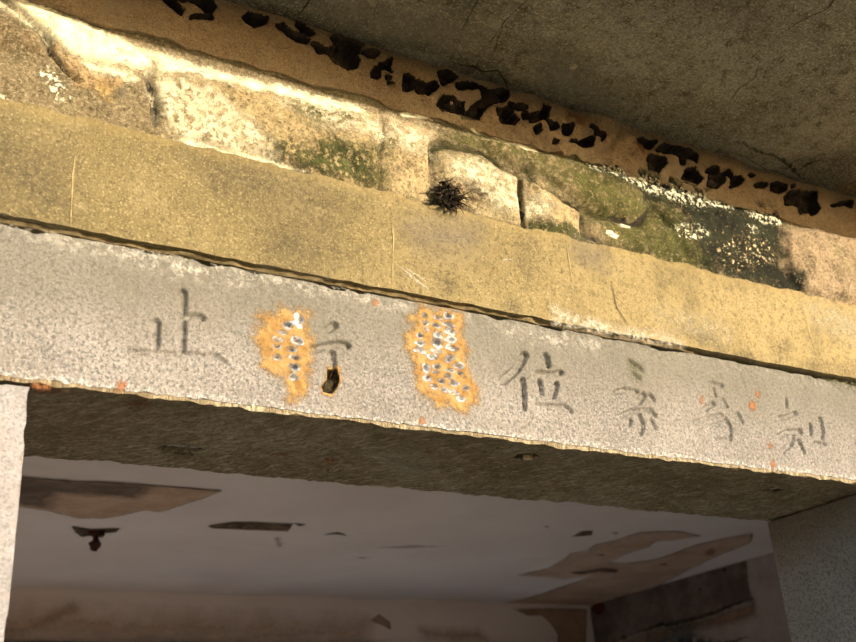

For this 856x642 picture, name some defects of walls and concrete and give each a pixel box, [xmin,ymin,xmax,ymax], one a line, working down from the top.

spalling [162,0,217,21]
water stain [0,0,432,186]
spalling [242,11,607,148]
water stain [444,128,610,220]
spalling [637,136,854,216]
spalling [321,366,342,397]
peeling [209,522,303,531]
peeling [507,531,753,642]